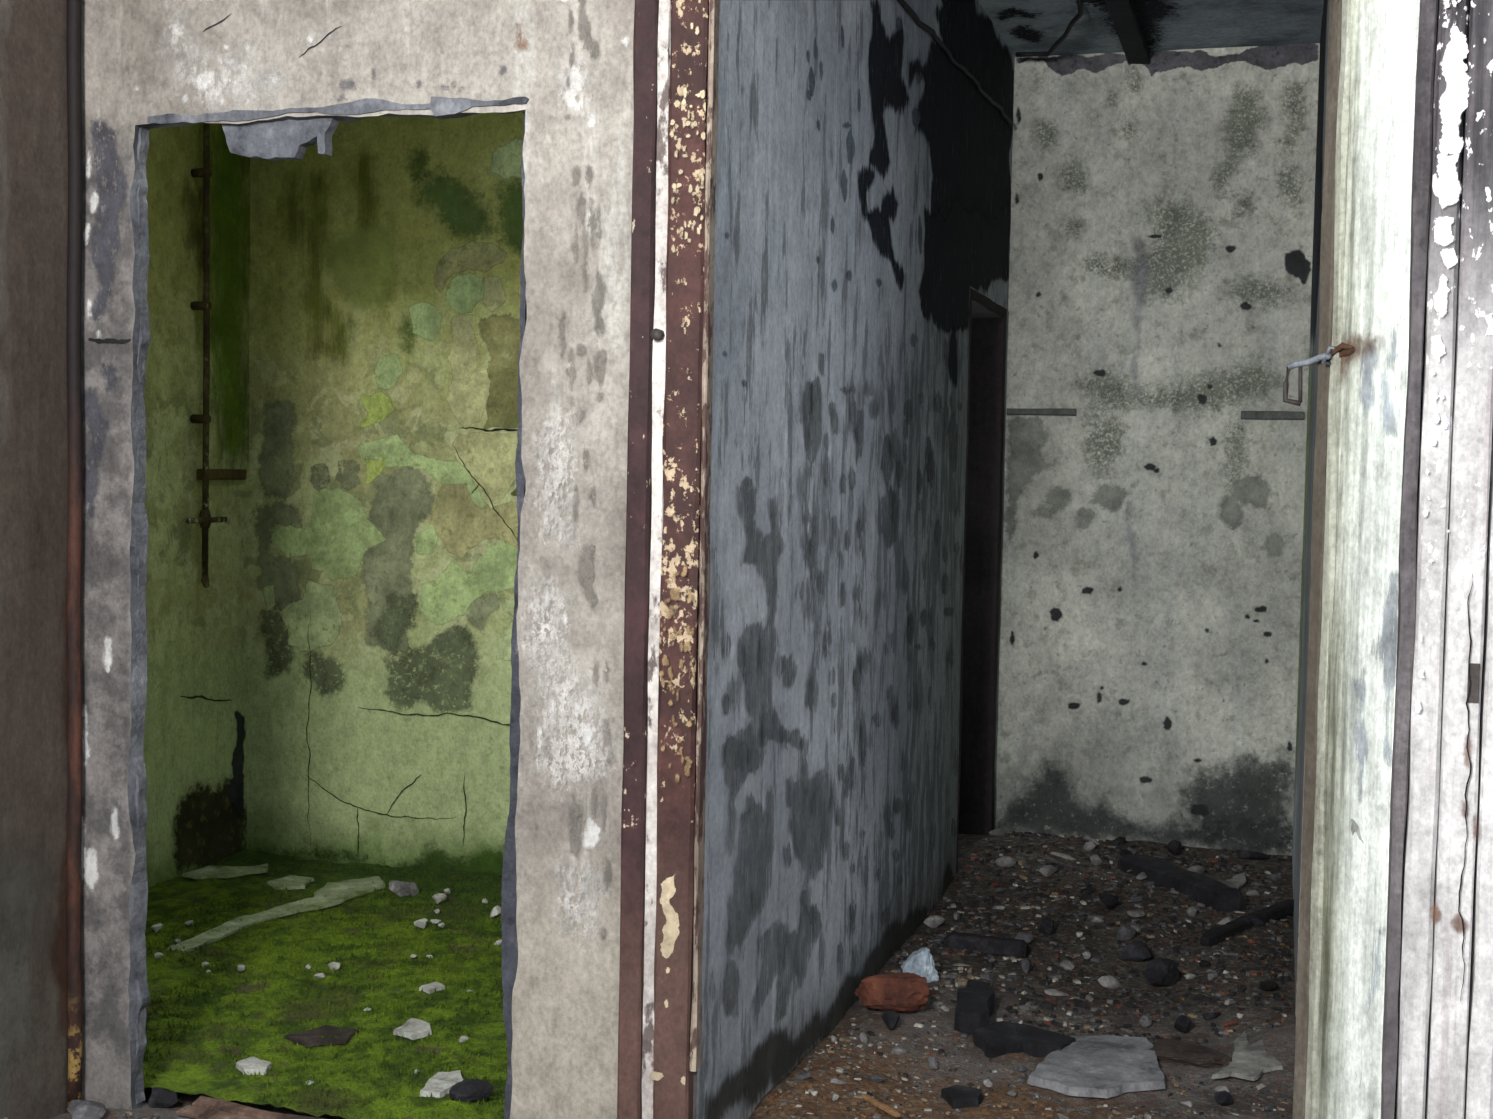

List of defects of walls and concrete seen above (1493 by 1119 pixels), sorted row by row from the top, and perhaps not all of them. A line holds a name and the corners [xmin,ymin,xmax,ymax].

damp [409,150,523,255]
damp [857,0,1014,387]
damp [1278,0,1327,344]
peeling [1433,0,1471,317]
crack [180,695,246,817]
flaking render [81,0,612,1119]
crack [306,615,467,851]
crack [358,707,510,726]
peeling [710,354,963,1022]
damp [998,365,1312,854]
peeling [660,875,679,974]
damp [704,865,954,1119]